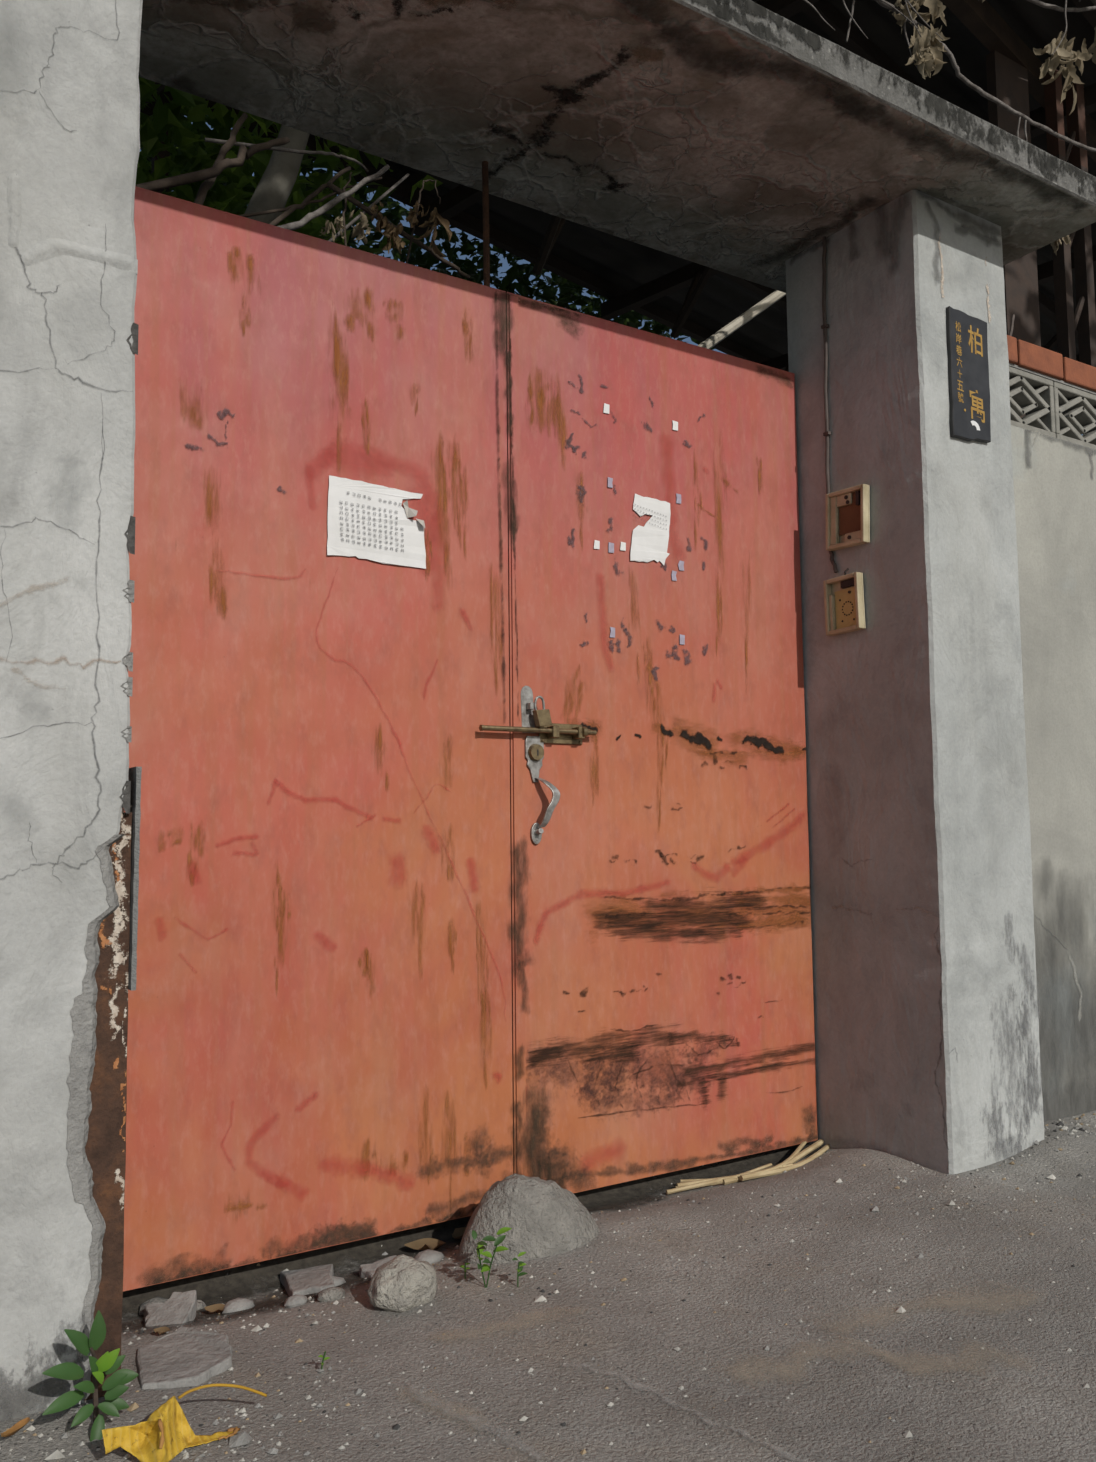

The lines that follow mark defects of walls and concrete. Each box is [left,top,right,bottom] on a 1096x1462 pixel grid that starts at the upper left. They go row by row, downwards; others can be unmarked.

damp [488,49,630,193]
damp [621,0,1085,270]
rust [334,290,373,398]
rust [424,444,467,571]
rust [491,494,518,702]
rust [593,887,809,942]
spalling [0,767,142,1419]
rust [530,1025,815,1107]
rust [532,1109,818,1184]
damp [1035,898,1096,1122]
rust [279,1224,376,1257]
damp [0,1358,83,1422]